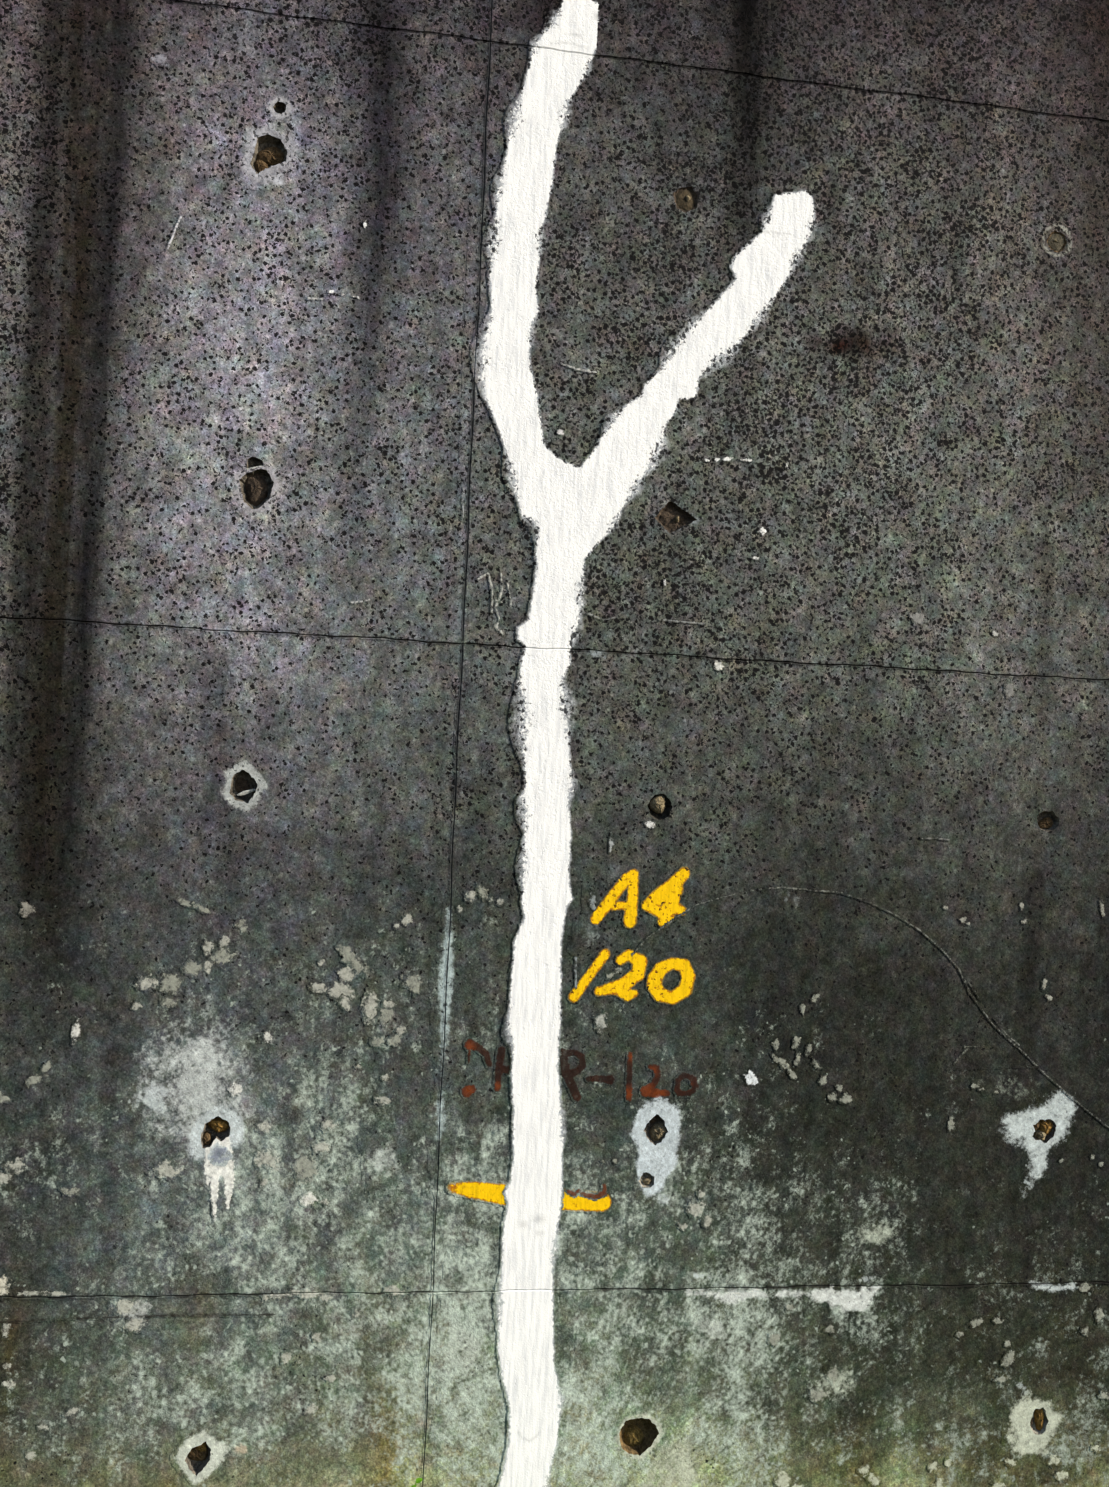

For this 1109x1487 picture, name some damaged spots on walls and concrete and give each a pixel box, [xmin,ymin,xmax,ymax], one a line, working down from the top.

water stain [446,0,561,829]
water stain [0,0,464,1475]
water stain [275,1216,505,1460]
water stain [564,1182,609,1201]
water stain [567,871,612,1008]
water stain [624,1094,686,1213]
water stain [551,1212,913,1487]
crack [631,885,1109,1128]
water stain [1000,1364,1072,1465]
water stain [970,865,1109,1202]
water stain [1024,1276,1079,1297]